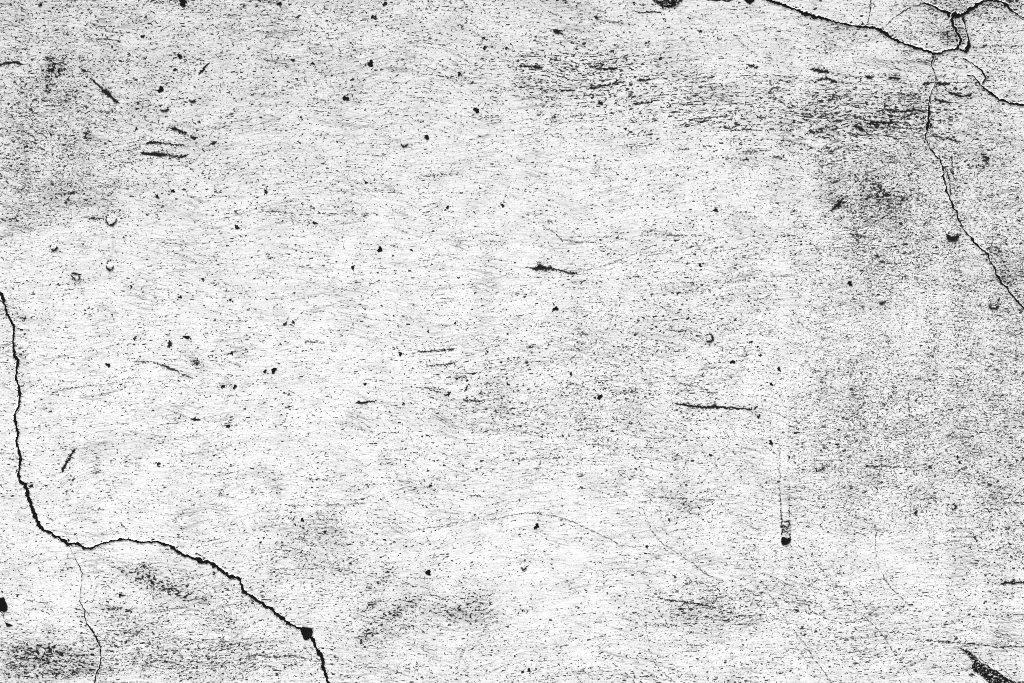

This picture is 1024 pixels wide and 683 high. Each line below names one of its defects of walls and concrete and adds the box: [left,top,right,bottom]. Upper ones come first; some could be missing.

crack [761,0,1024,312]
crack [0,286,332,683]